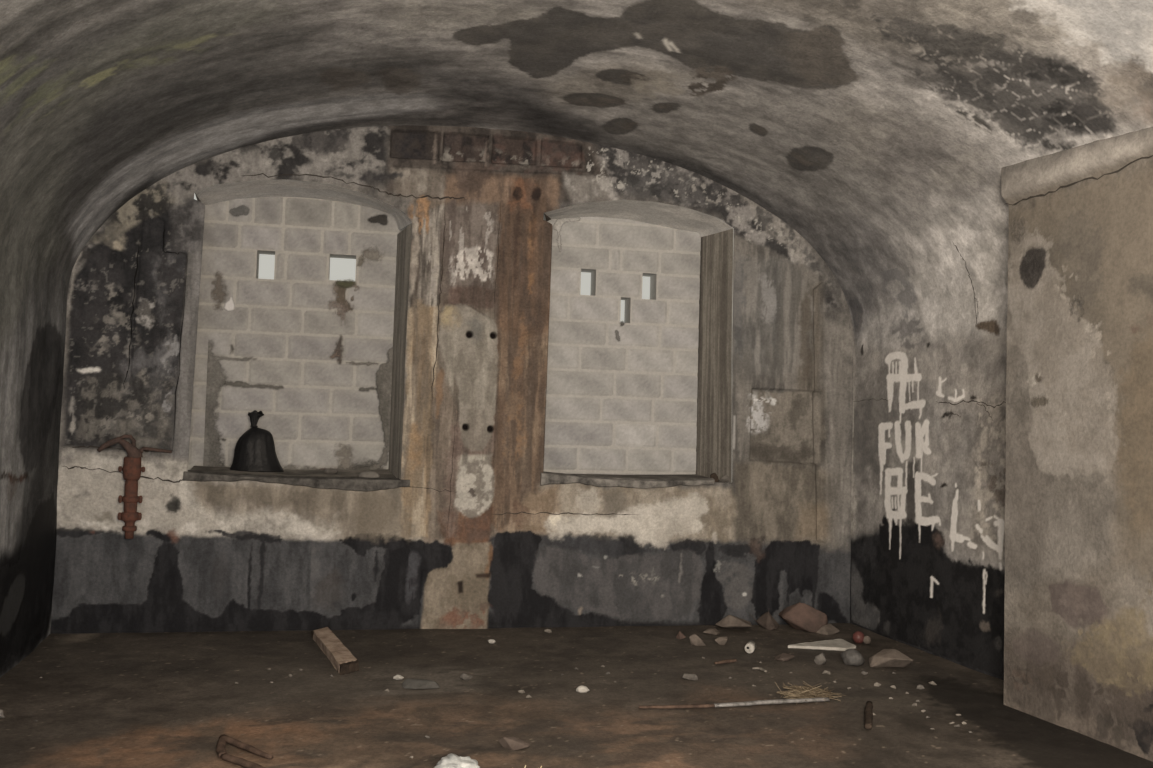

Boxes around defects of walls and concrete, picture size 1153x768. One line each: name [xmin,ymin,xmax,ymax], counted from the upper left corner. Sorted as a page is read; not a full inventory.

damp [626,67,697,102]
crack [1003,155,1153,206]
crack [240,173,465,531]
corrosion [401,128,589,629]
damp [1007,165,1153,580]
damp [183,480,422,616]
peeling [531,485,770,625]
damp [1010,577,1153,696]
damp [899,673,1153,768]